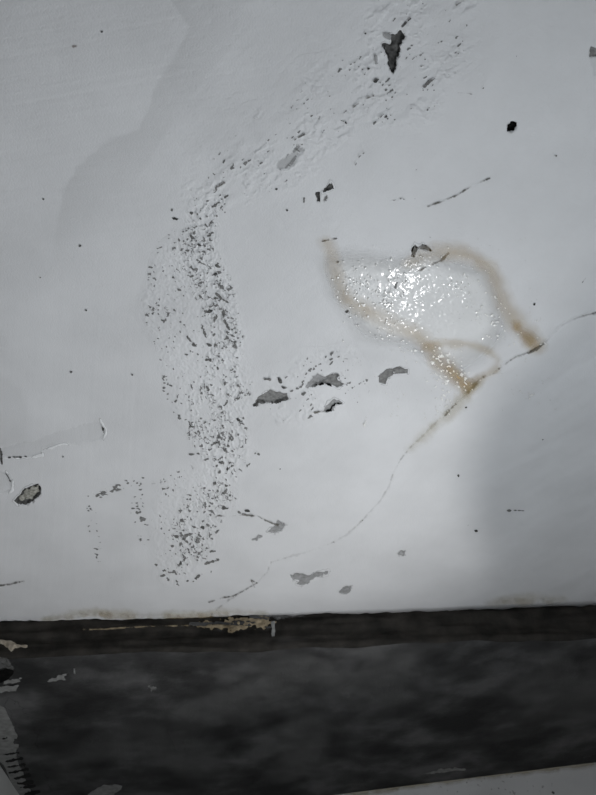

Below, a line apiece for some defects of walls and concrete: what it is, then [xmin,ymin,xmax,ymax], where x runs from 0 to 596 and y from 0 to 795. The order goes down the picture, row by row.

flaking render [374,18,411,73]
flaking render [315,180,335,202]
damp [329,247,511,418]
peeling [378,366,409,386]
peeling [253,378,289,407]
peeling [306,373,345,414]
flaking render [0,443,68,507]
peeling [238,510,285,541]
flaking render [291,568,330,587]
spalling [0,657,14,683]
flaking render [0,705,31,795]